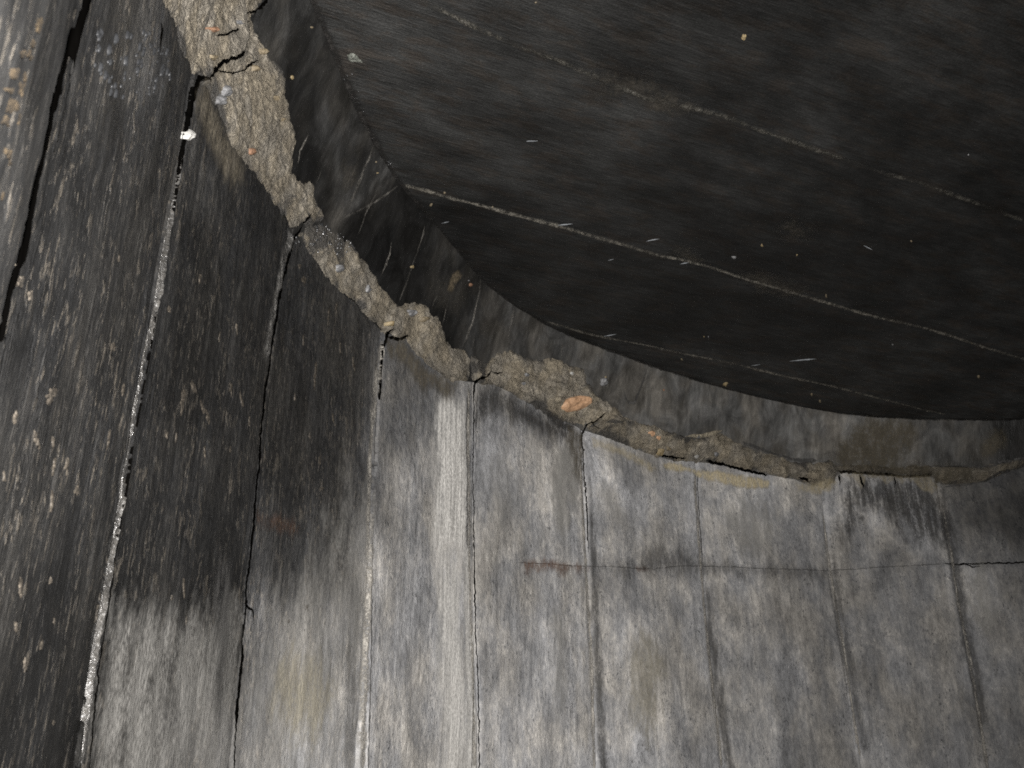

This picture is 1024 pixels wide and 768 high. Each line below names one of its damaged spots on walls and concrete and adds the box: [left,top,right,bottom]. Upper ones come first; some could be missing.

crack [0,0,91,341]
crack [234,211,313,768]
crack [466,370,503,768]
crack [519,369,1024,576]